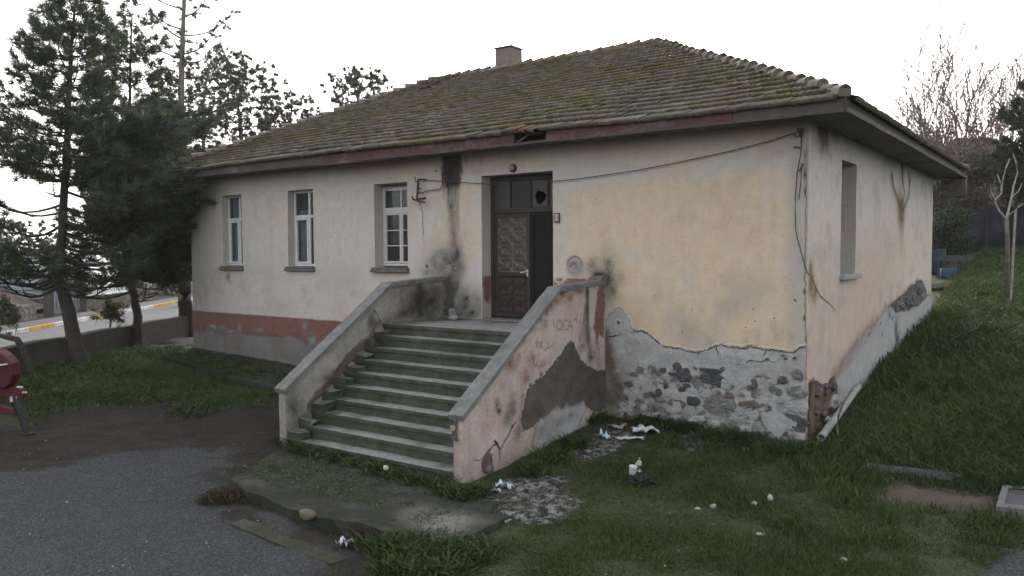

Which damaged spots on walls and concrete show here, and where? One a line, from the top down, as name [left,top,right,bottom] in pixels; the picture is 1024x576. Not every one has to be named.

leakage [442,155,462,217]
leakage [402,250,475,318]
spalling [521,278,932,450]
crack [475,421,517,461]